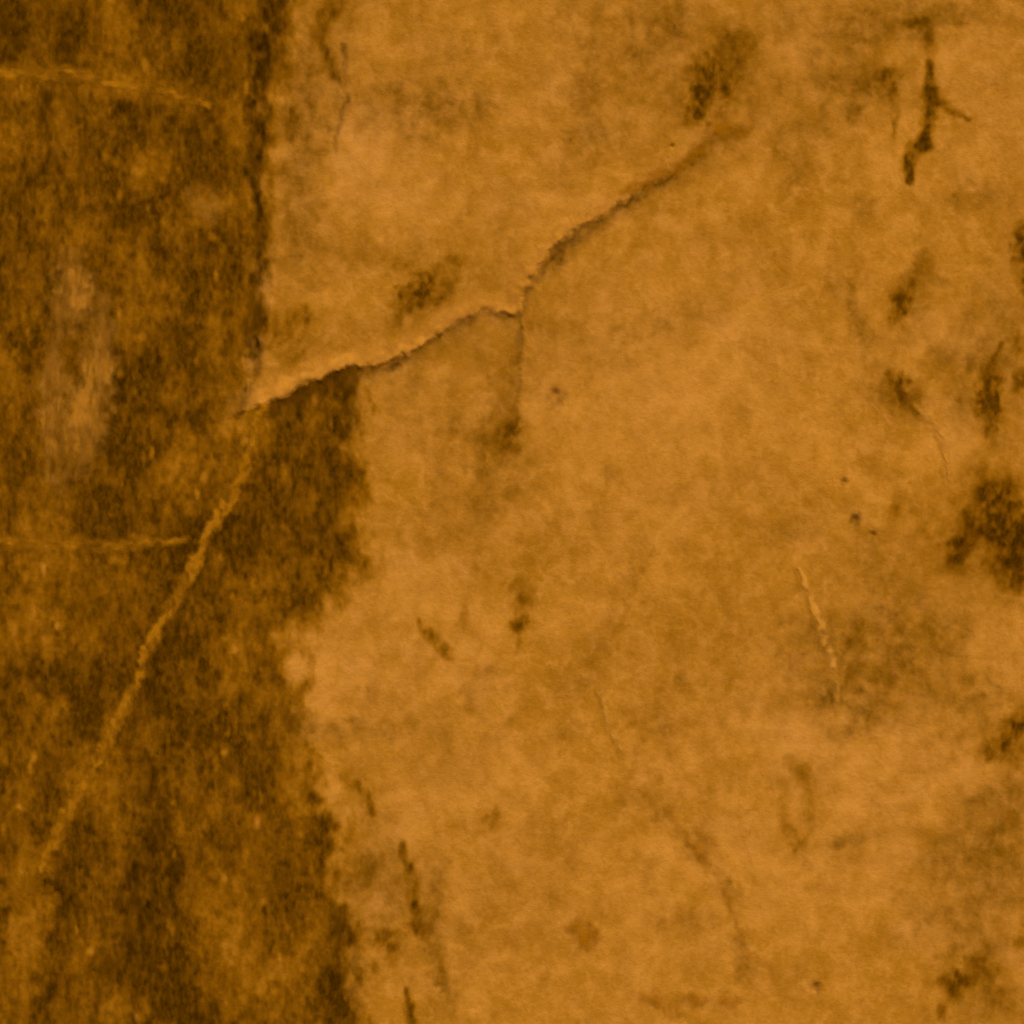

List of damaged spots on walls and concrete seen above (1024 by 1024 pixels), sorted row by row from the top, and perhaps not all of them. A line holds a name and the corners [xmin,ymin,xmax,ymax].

leakage [0,0,364,1024]
crack [0,176,673,873]
leakage [971,482,1024,578]